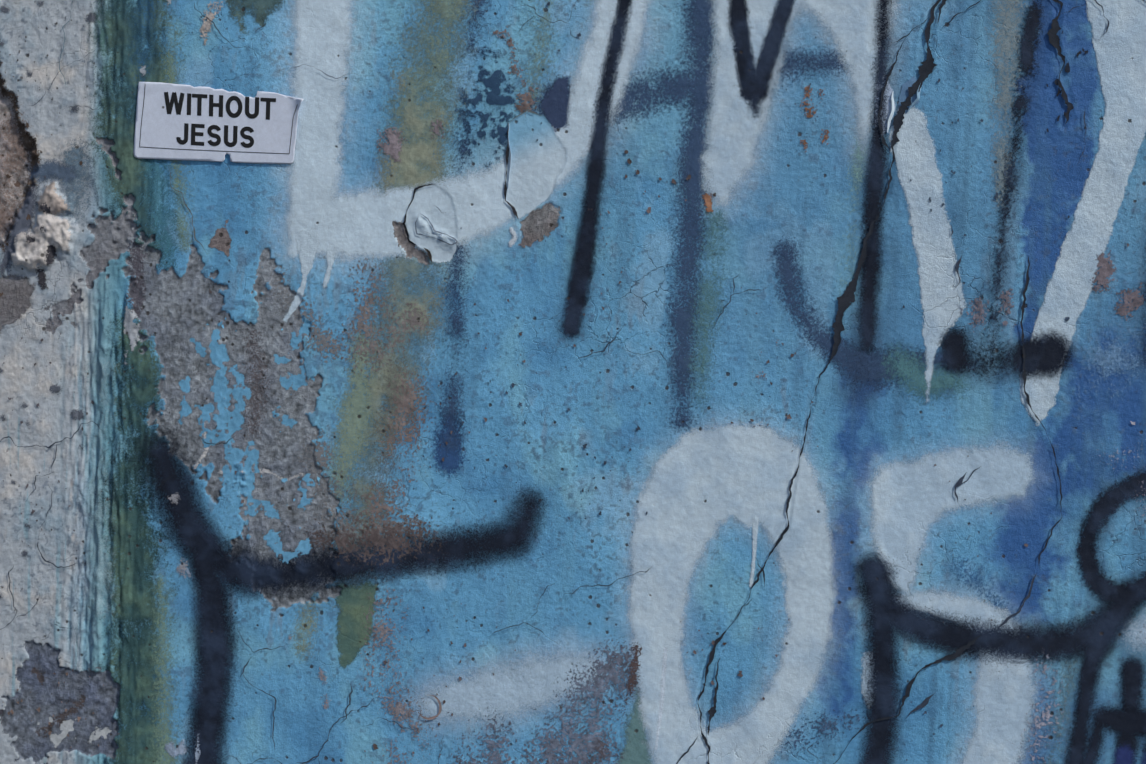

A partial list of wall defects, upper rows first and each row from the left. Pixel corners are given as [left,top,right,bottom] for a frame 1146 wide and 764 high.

spalling [0,36,47,252]
peeling [504,109,567,248]
crack [1047,0,1109,163]
peeling [40,184,644,764]
crack [578,324,667,361]
crack [677,0,981,764]
crack [807,257,1062,764]
peeling [0,640,121,764]